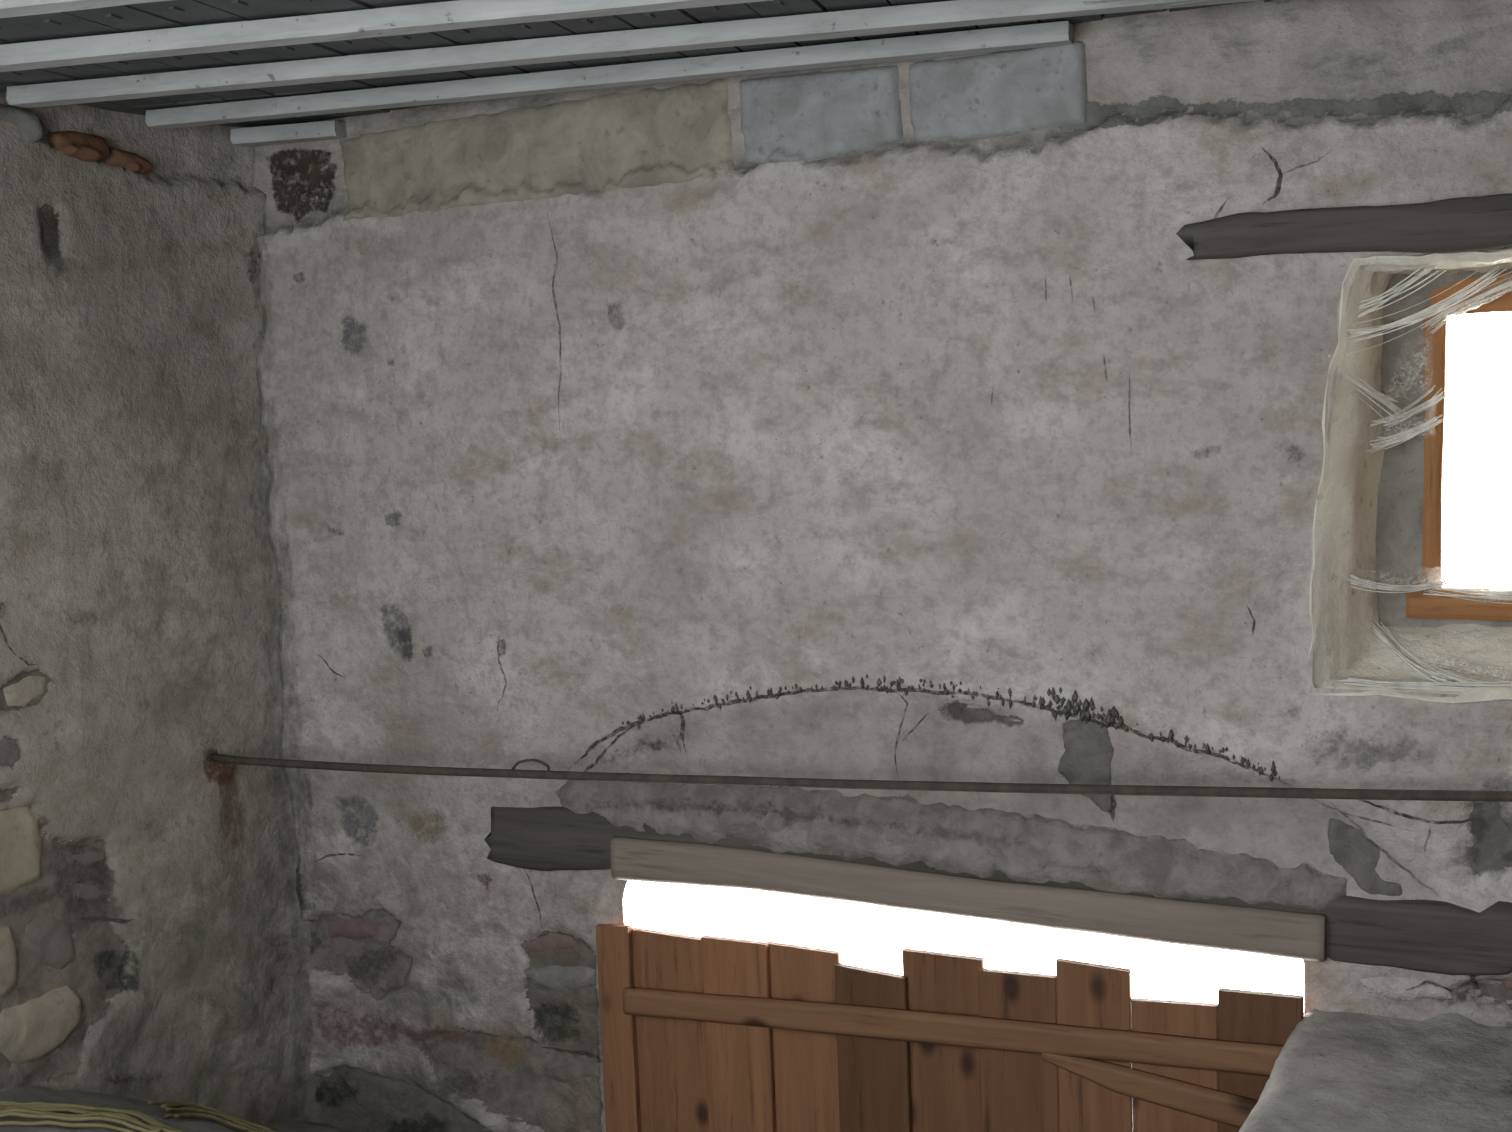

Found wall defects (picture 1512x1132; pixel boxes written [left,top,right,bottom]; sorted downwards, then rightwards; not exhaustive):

spalling [0,736,20,767]
spalling [0,669,53,711]
crack [569,674,1291,785]
crack [1323,803,1430,889]
spalling [1361,800,1512,877]
spalling [0,786,139,1090]
spalling [311,909,413,1001]
spalling [315,931,603,1132]